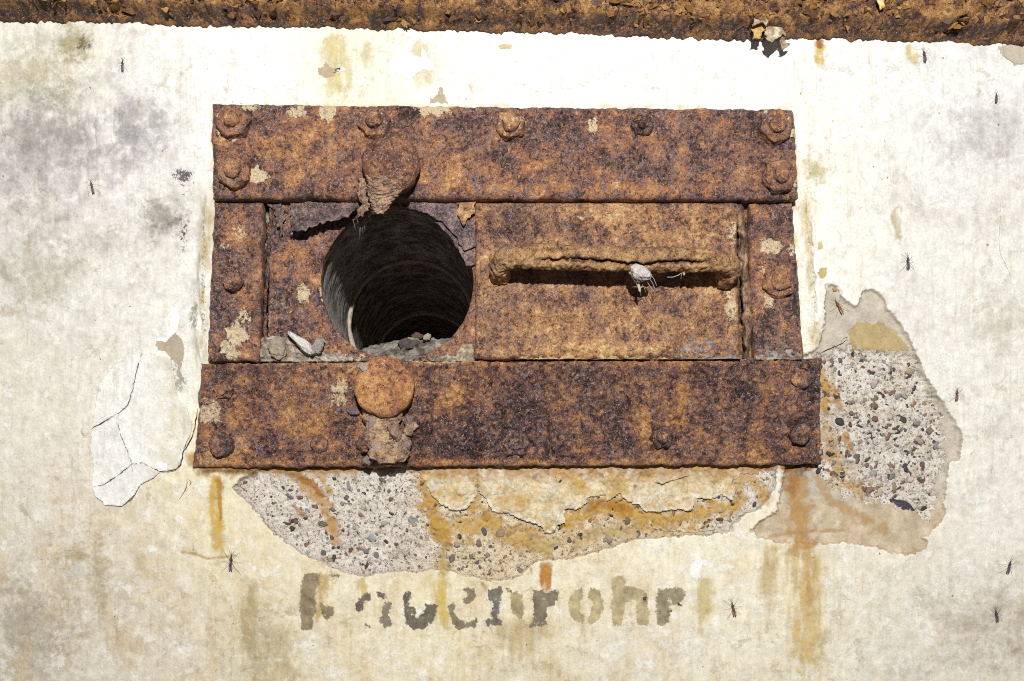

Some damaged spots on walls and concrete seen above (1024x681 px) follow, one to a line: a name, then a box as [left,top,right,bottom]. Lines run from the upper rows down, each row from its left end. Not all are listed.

corrosion [262,178,371,354]
corrosion [403,188,476,266]
corrosion [734,204,752,358]
peeling [90,307,192,506]
crack [92,354,198,505]
corrosion [188,407,555,621]
spalling [232,241,963,582]
corrosion [561,426,868,672]
corrosion [820,371,841,413]